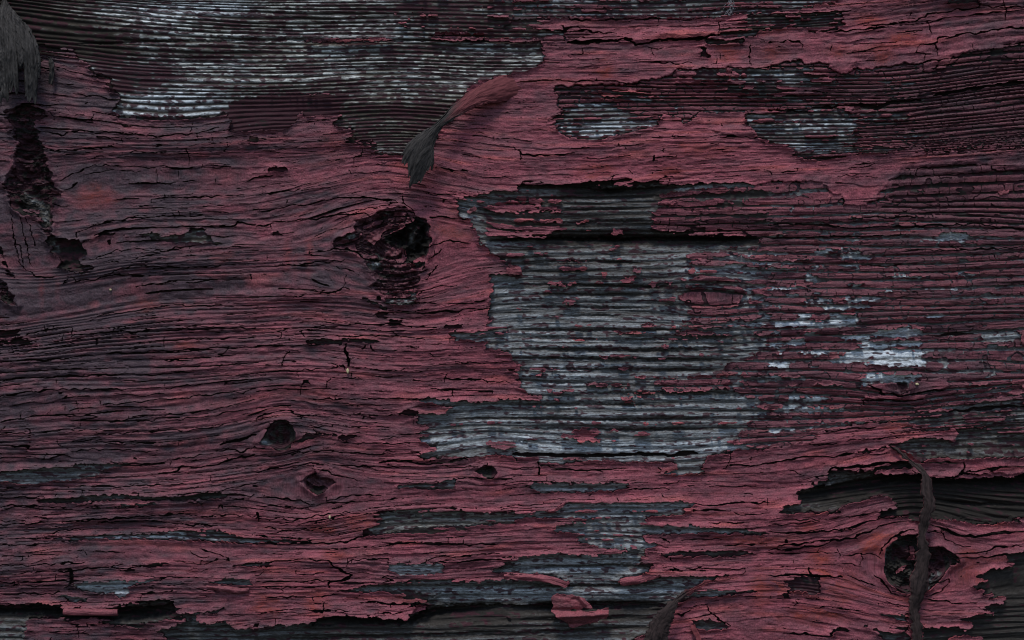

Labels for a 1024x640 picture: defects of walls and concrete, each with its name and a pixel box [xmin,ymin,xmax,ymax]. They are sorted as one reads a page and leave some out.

peeling [0,0,1024,188]
crack [0,112,698,613]
peeling [396,166,1024,524]
peeling [0,481,769,640]